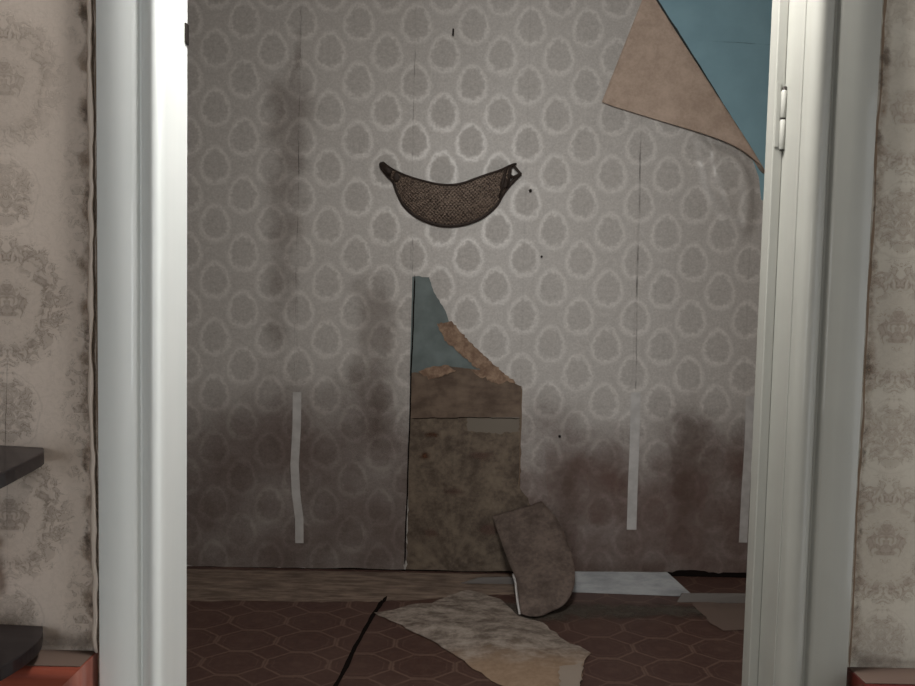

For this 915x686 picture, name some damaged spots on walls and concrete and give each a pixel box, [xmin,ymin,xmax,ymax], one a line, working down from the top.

peeling [437,321,516,385]
leakage [525,446,751,574]